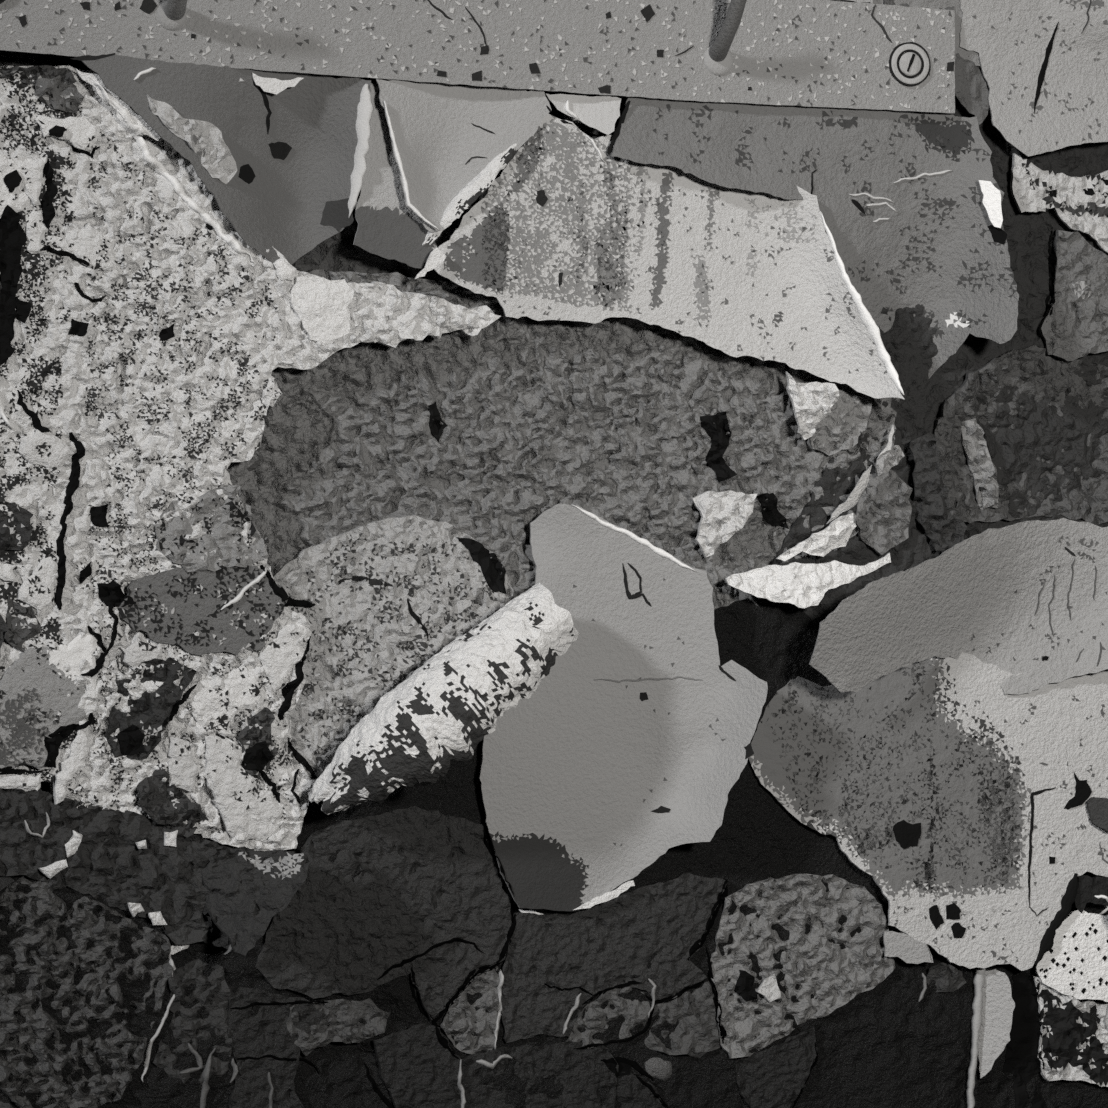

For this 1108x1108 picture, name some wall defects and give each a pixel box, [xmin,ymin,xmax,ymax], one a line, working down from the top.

crack [871,5,892,43]
flaking render [0,65,99,151]
spalling [0,154,116,366]
flaking render [0,495,58,653]
flaking render [17,429,74,470]
spalling [79,561,92,583]
spalling [90,504,109,527]
spalling [154,53,1108,1058]
spalling [97,564,310,760]
spalling [0,668,318,1108]
peeling [978,969,1015,1078]
spalling [1032,947,1108,1087]